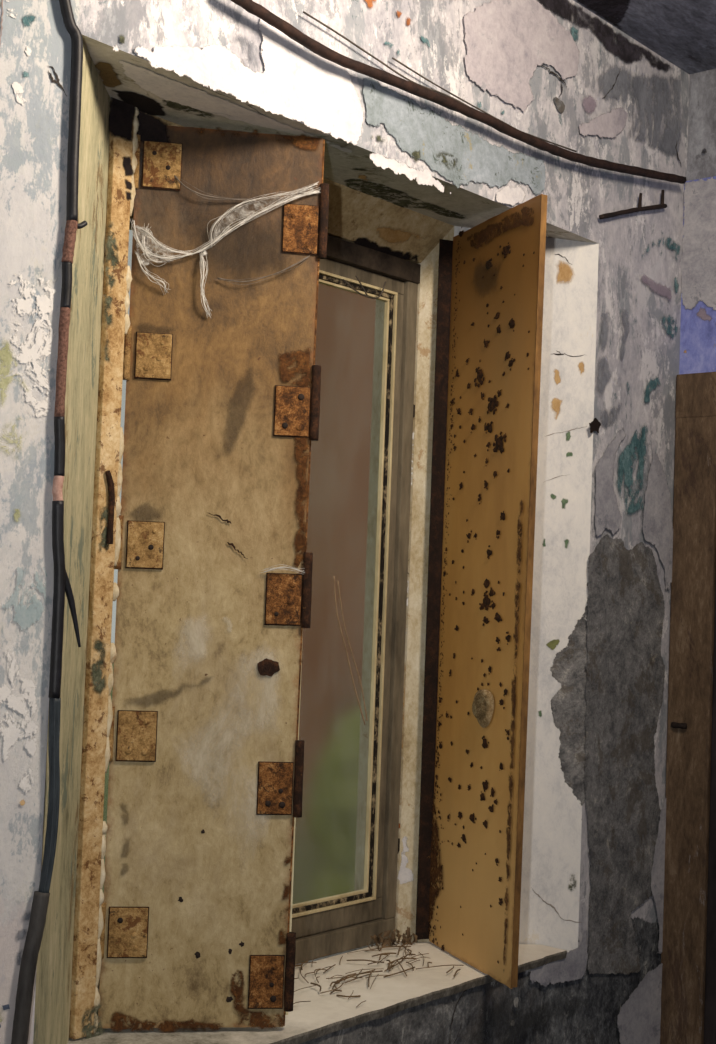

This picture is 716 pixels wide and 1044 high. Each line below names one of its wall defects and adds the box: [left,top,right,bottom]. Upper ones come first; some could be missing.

water stain [95,62,122,87]
peeling [642,177,716,321]
peeling [597,312,611,394]
peeling [621,311,629,360]
peeling [662,316,678,338]
peeling [644,377,661,403]
flaking render [530,405,673,1044]